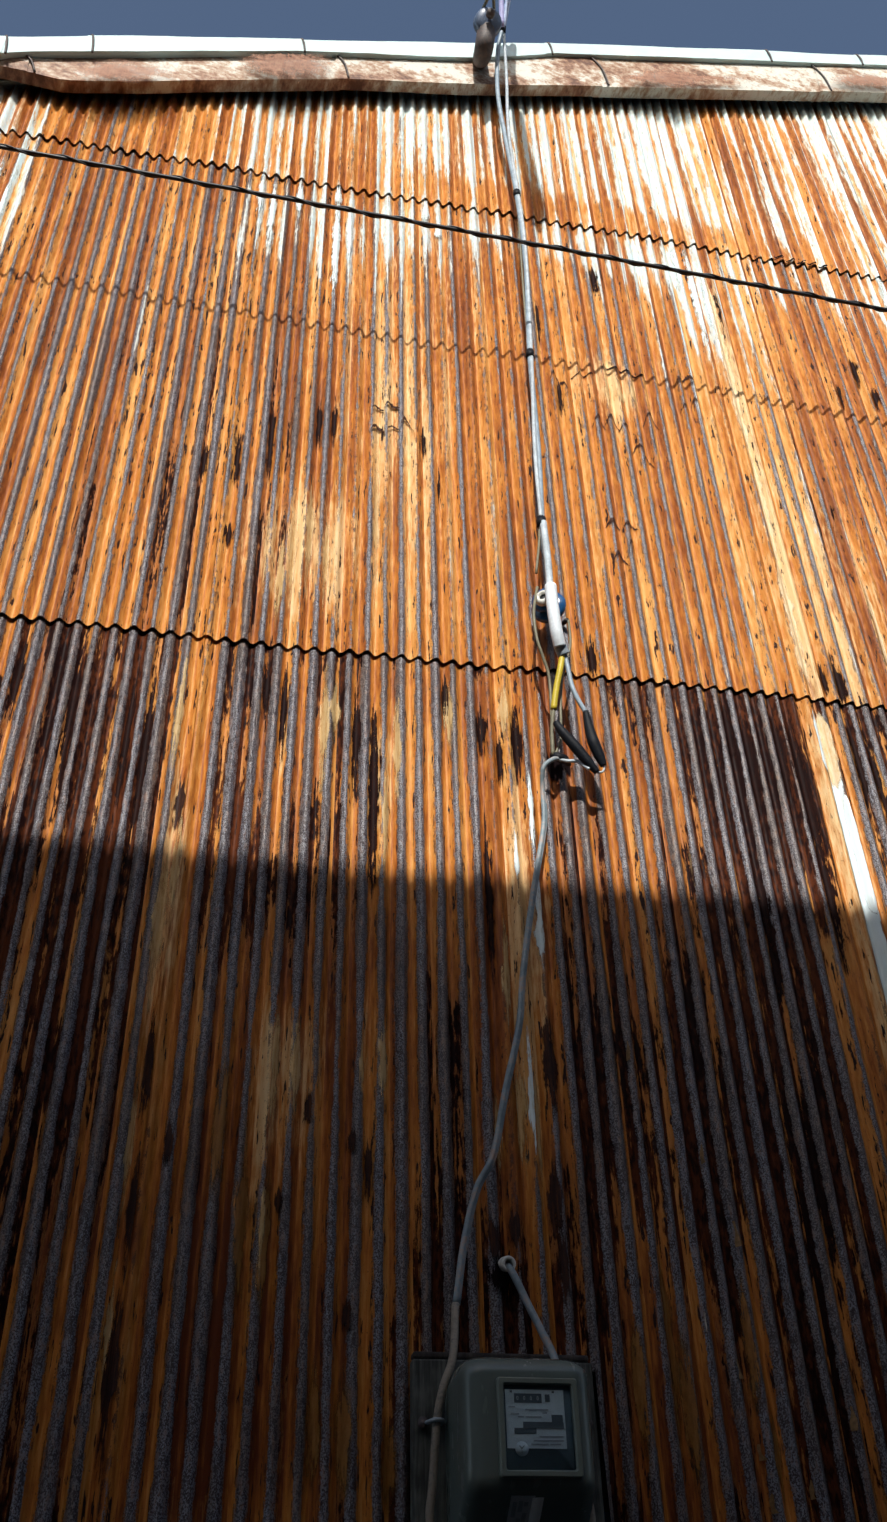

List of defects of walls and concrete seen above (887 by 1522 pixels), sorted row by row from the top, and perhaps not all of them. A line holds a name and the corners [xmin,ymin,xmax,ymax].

rust [75,60,171,81]
rust [244,53,330,78]
rust [625,68,738,87]
rust [170,774,186,830]
rust [137,1008,157,1121]
rust [304,1089,312,1124]
rust [541,1014,559,1116]
rust [122,1155,140,1271]
rust [211,1063,282,1311]
rust [546,1154,571,1306]
rust [93,1288,123,1482]
rust [304,1361,352,1507]